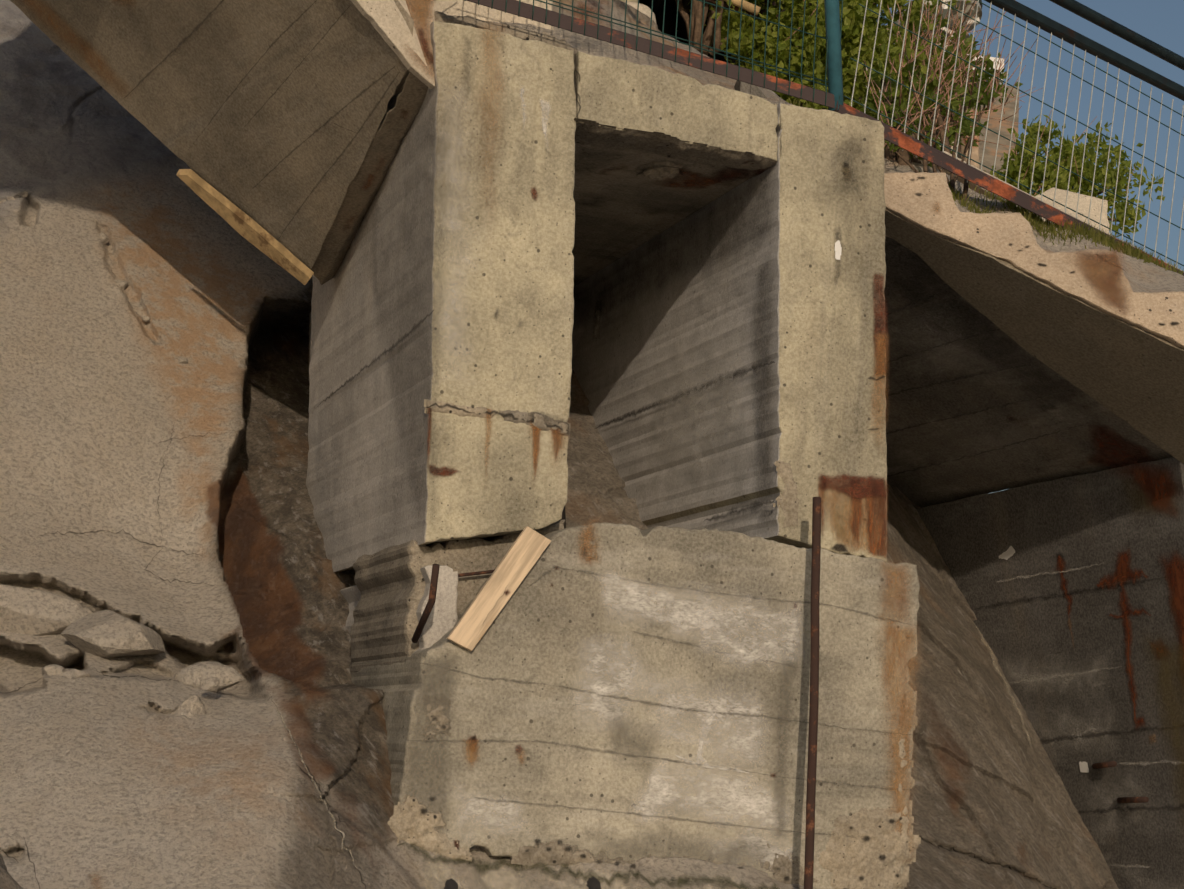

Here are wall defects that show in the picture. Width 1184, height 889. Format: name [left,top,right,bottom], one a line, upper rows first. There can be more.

rust [1084,253,1125,301]
crack [316,310,434,408]
rust [870,274,888,394]
crack [424,362,775,439]
rust [428,408,456,476]
rust [819,474,887,556]
rust [1096,552,1152,727]
rust [1151,556,1184,772]
spalling [387,794,472,862]
spalling [511,839,651,870]
spalling [707,688,921,889]